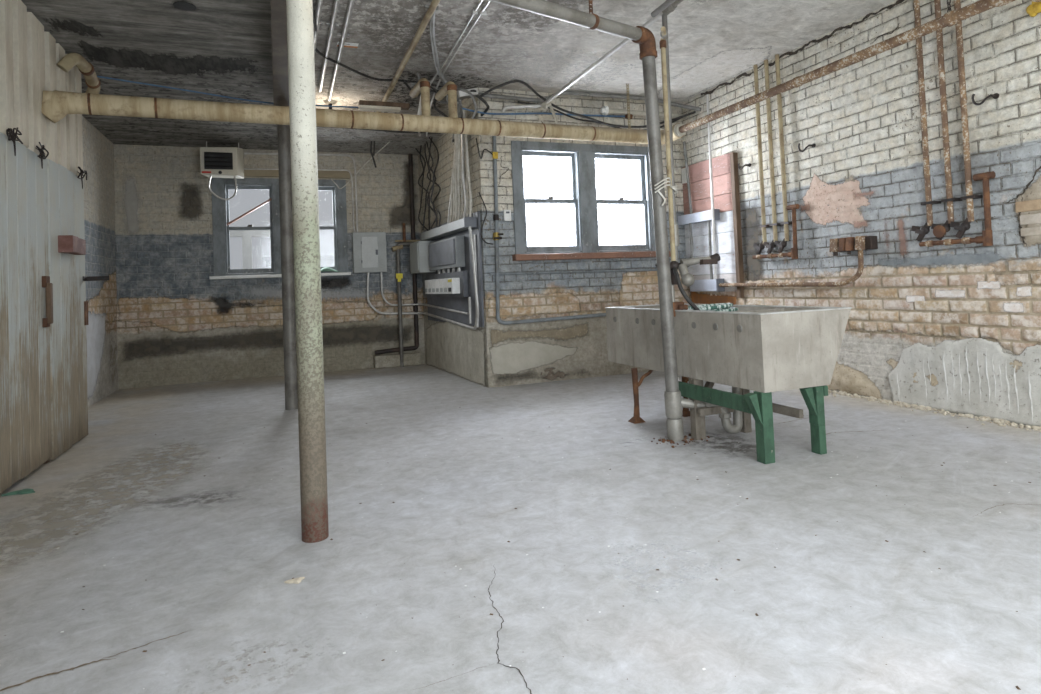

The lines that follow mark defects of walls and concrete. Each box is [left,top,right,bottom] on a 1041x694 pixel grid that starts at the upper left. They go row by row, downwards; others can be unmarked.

peeling [801,174,874,228]
peeling [1002,176,1041,248]
peeling [619,268,659,306]
peeling [674,265,1041,372]
spalling [827,362,1041,432]
crack [0,629,195,691]
crack [411,564,532,694]